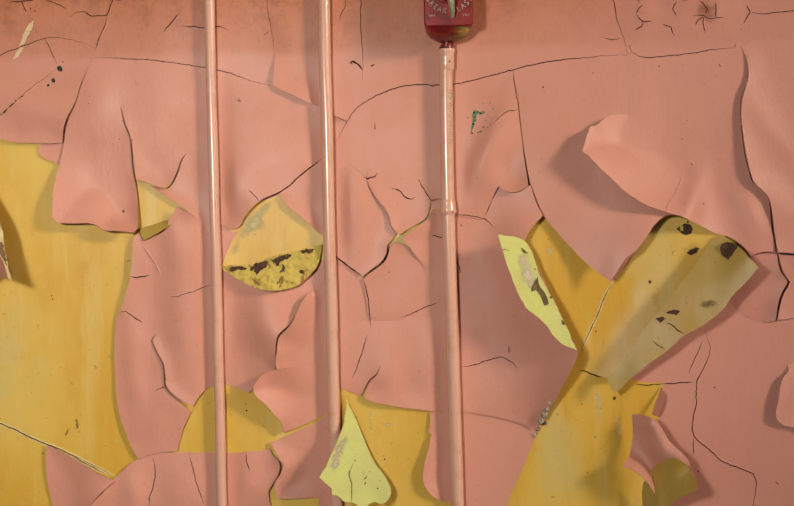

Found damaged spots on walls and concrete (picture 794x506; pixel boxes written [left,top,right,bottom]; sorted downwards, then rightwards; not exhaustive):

crack [0,0,271,115]
crack [334,0,794,143]
crack [248,159,322,201]
crack [363,173,440,202]
crack [0,421,117,477]
peeling [0,21,217,506]
peeling [216,46,451,506]
crack [336,246,390,379]
crack [460,345,519,370]
crack [582,281,613,349]
peeling [453,39,794,506]
crack [635,329,780,506]